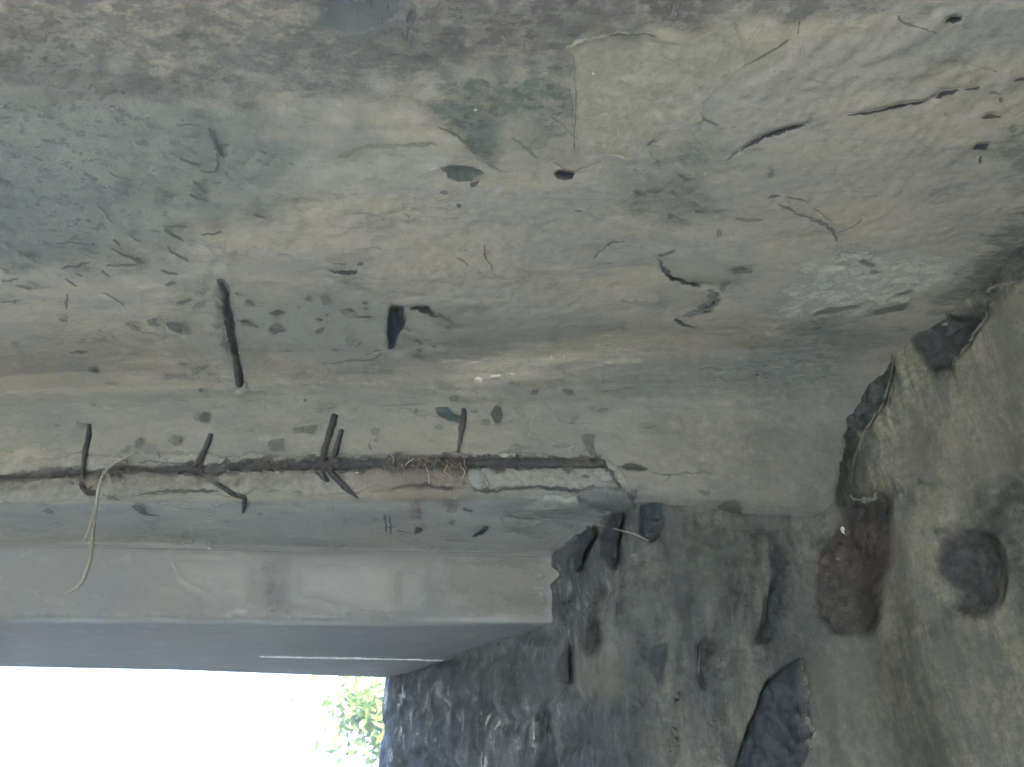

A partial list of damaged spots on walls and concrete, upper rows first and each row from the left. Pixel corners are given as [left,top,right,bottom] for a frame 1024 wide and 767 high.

corrosion [364,467,471,518]